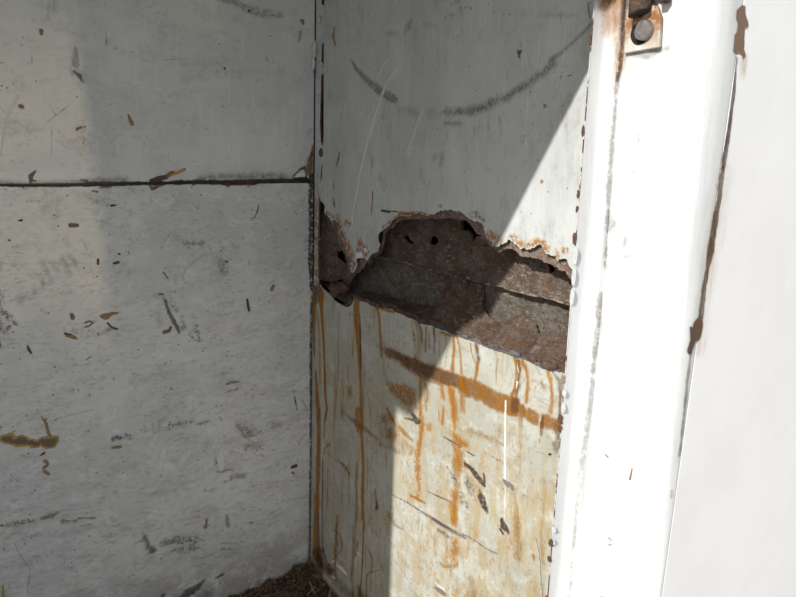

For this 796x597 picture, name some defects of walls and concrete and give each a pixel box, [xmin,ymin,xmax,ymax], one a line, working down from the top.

peeling [466,246,578,306]
peeling [0,416,59,475]
corrosion [313,284,336,579]
corrosion [348,295,565,597]